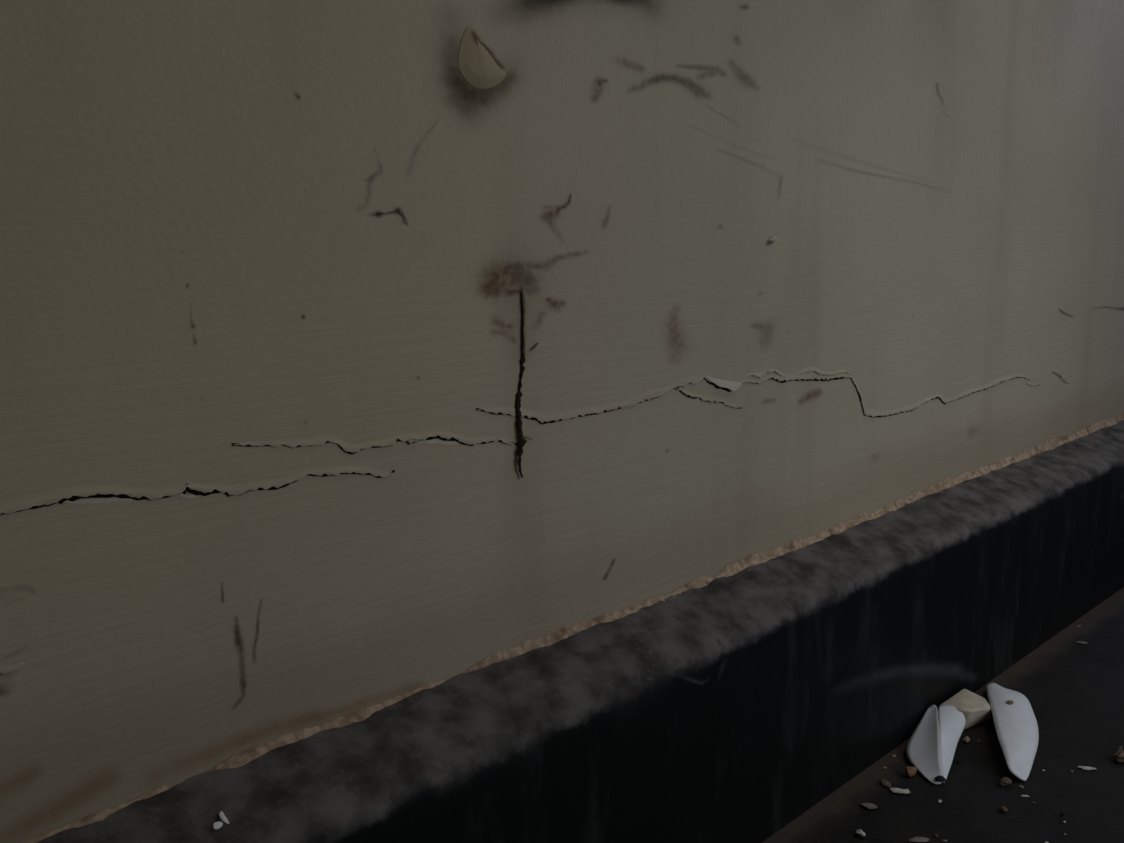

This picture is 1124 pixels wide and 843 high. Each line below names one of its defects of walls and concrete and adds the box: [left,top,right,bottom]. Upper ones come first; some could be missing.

crack [0,292,1061,516]